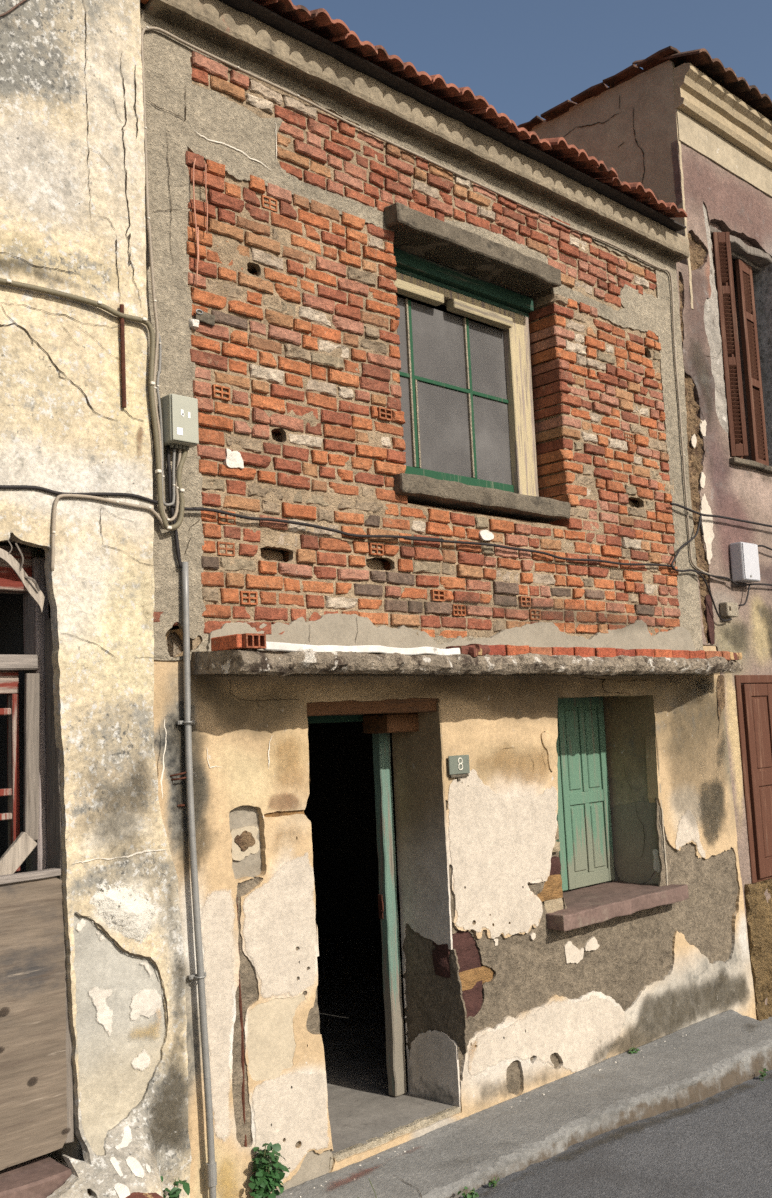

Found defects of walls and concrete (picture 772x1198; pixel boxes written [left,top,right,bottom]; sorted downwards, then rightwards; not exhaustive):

crack [83,1,277,308]
crack [565,95,645,182]
crack [0,252,78,274]
crack [0,302,143,421]
flaking render [678,204,729,644]
flaking render [541,732,558,772]
water stain [701,783,724,842]
flaking render [402,798,739,1077]
flaking render [73,913,166,1198]
water stain [151,1064,186,1148]
flaking render [506,1056,534,1095]
water stain [594,972,749,1060]